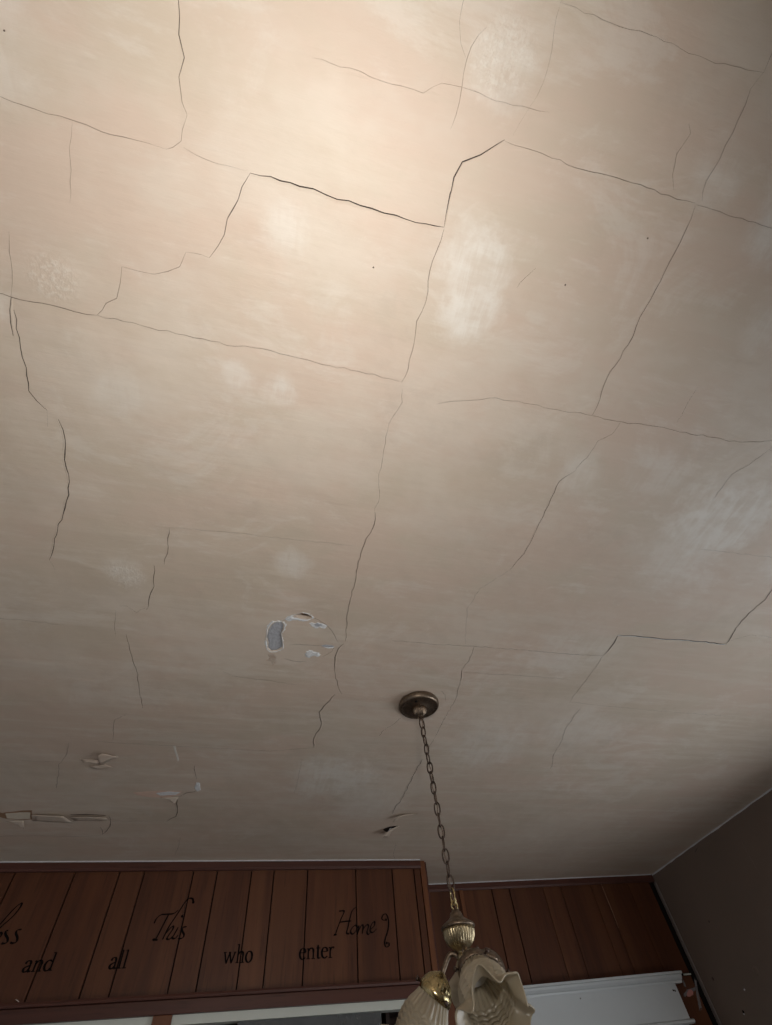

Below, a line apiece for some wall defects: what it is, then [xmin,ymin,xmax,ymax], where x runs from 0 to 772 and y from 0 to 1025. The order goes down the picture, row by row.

spalling [264,612,337,665]
crack [0,0,772,812]